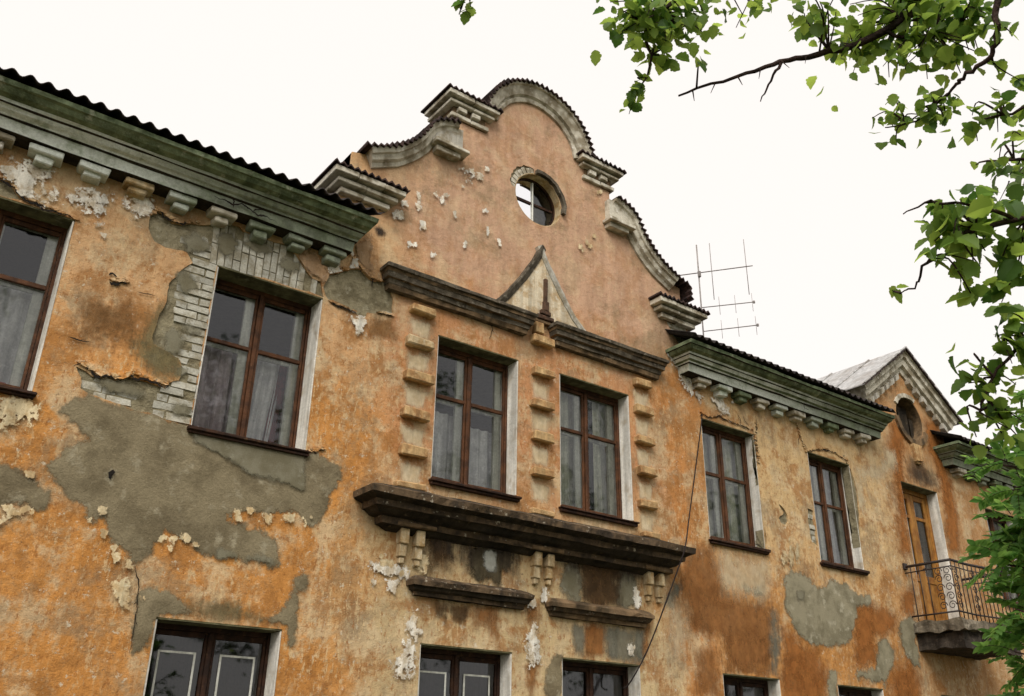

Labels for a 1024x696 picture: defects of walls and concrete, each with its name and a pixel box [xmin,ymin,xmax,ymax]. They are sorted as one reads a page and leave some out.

peeling [458,166,490,188]
peeling [392,191,457,230]
flaking render [0,156,392,426]
peeling [0,503,34,524]
peeling [234,507,313,527]
peeling [157,532,200,552]
peeling [86,505,145,622]
peeling [366,552,433,595]
peeling [528,586,550,608]
peeling [388,608,424,680]
peeling [523,621,542,670]